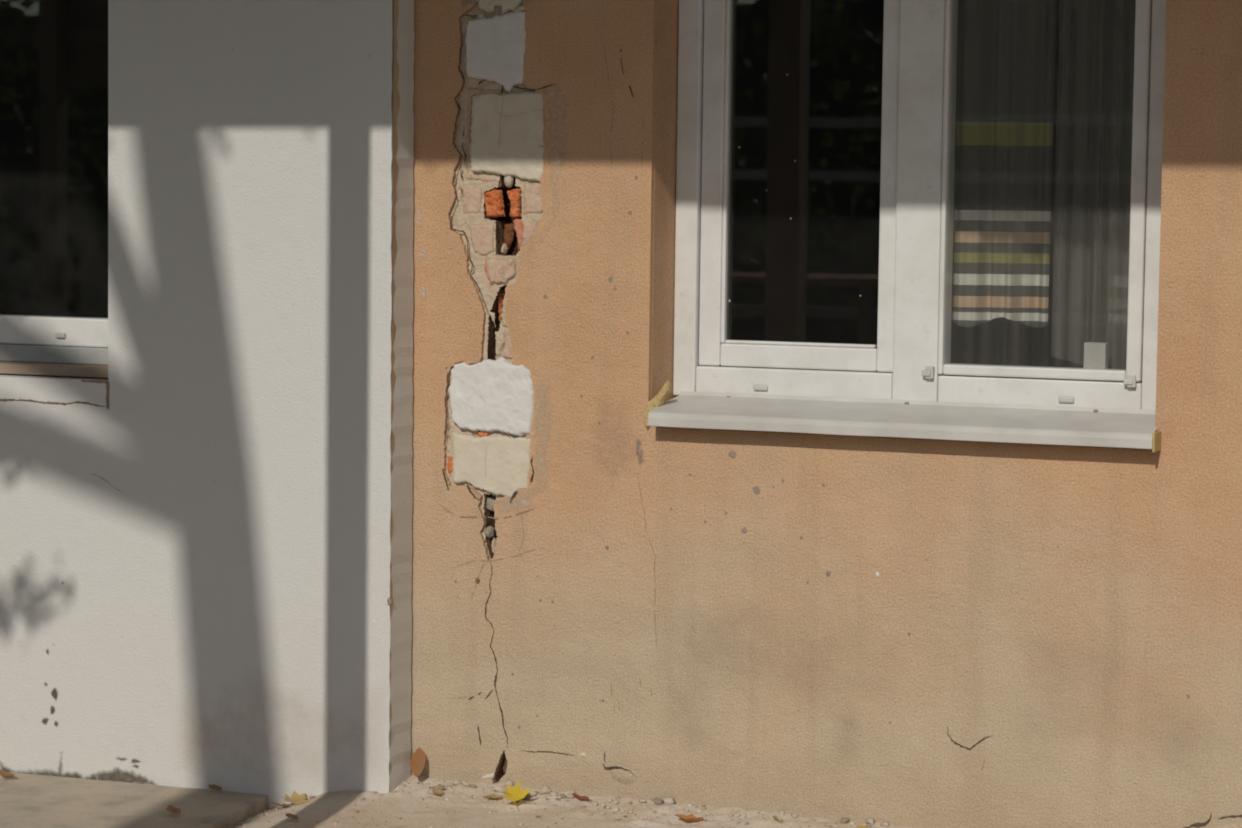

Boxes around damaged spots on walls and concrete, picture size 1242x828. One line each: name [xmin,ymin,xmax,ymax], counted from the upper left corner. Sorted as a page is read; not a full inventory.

crack [449,14,556,315]
flaking render [451,2,566,365]
crack [0,399,107,407]
crack [444,361,463,438]
flaking render [446,366,549,560]
crack [438,445,586,757]
crack [637,476,657,646]
crack [947,726,993,778]
crack [1183,814,1242,828]